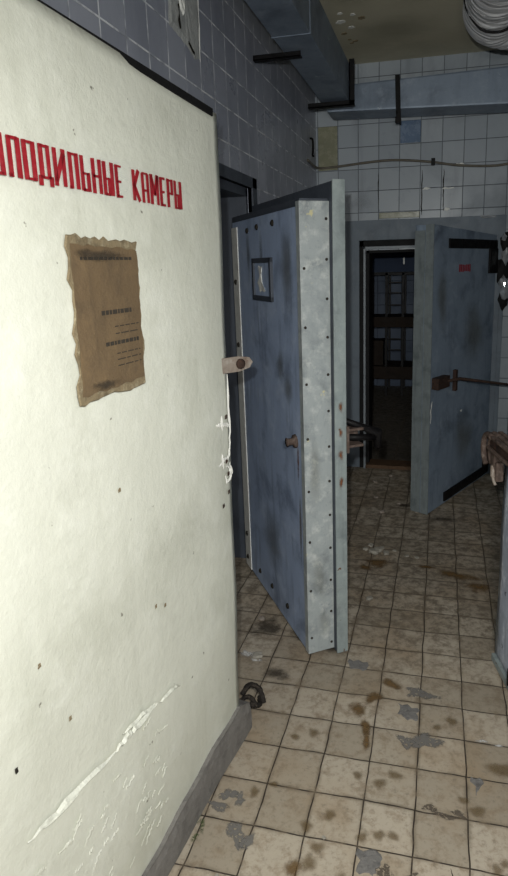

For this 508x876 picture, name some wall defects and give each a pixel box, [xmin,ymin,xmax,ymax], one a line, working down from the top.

spalling [168,0,201,62]
spalling [398,687,437,721]
spalling [397,733,444,750]
spalling [208,789,246,812]
spalling [226,822,254,851]
spalling [355,848,392,876]